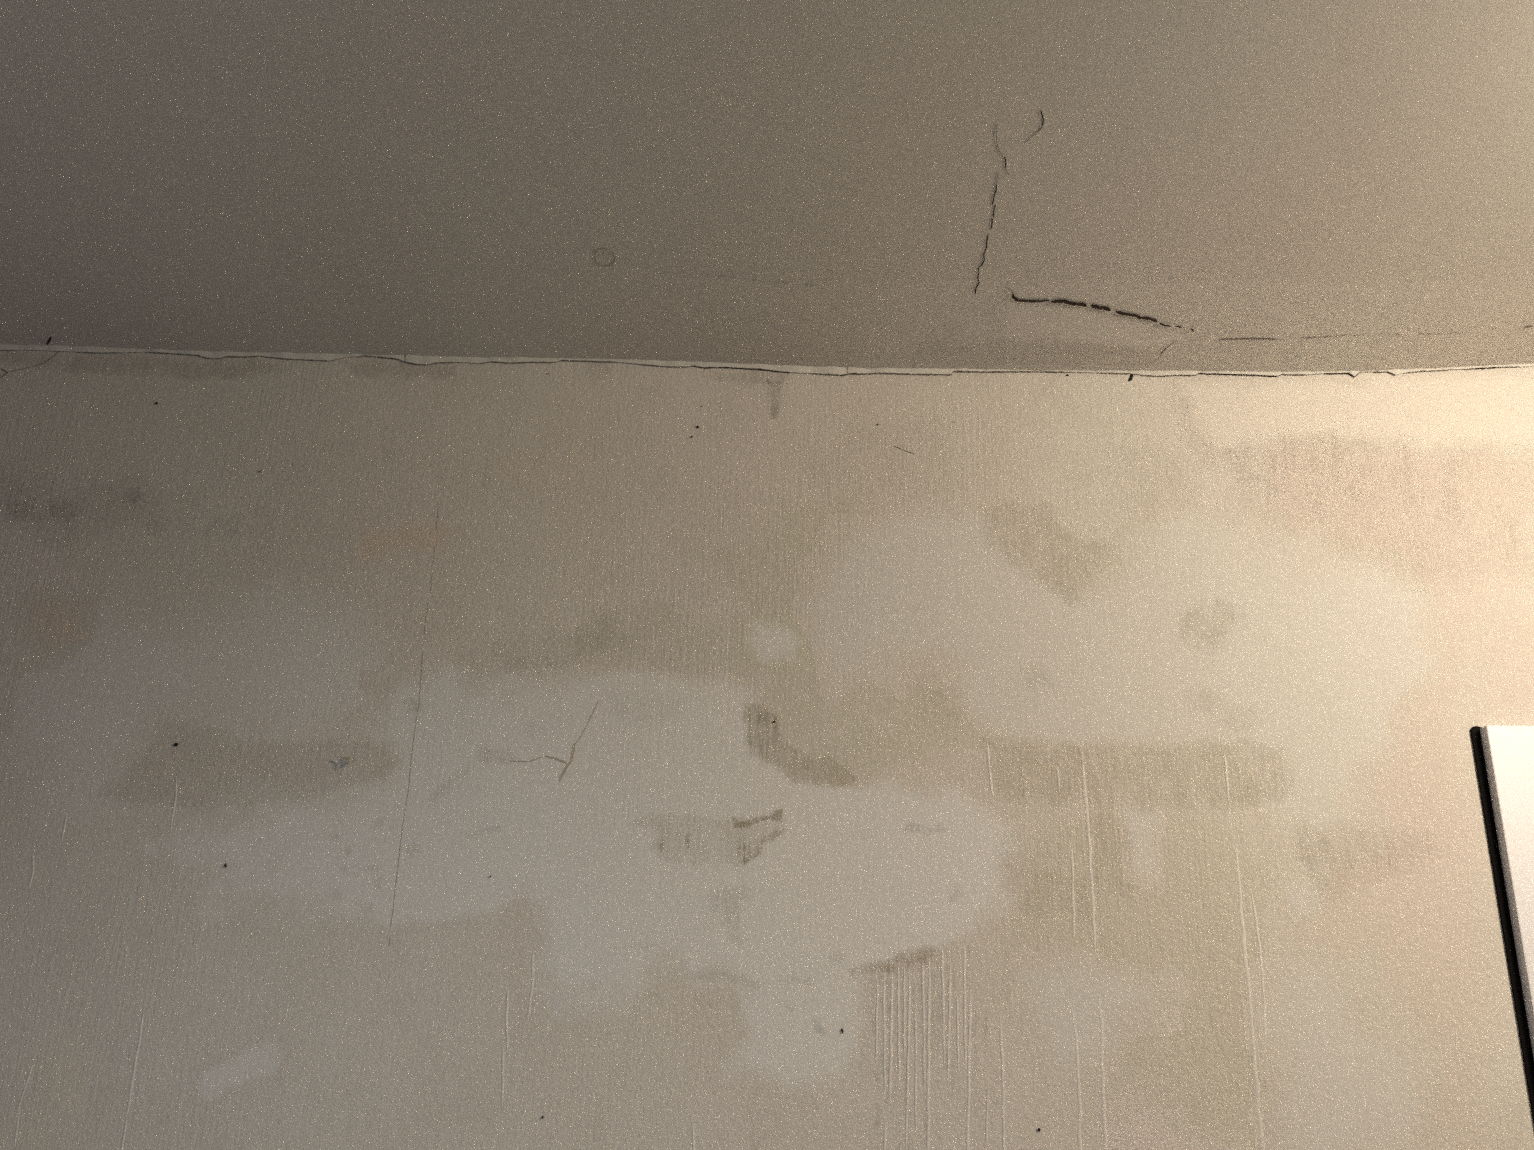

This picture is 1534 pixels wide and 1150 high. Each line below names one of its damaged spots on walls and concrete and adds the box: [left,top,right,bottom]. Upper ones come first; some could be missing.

crack [147,352,1066,376]
crack [975,110,1532,377]